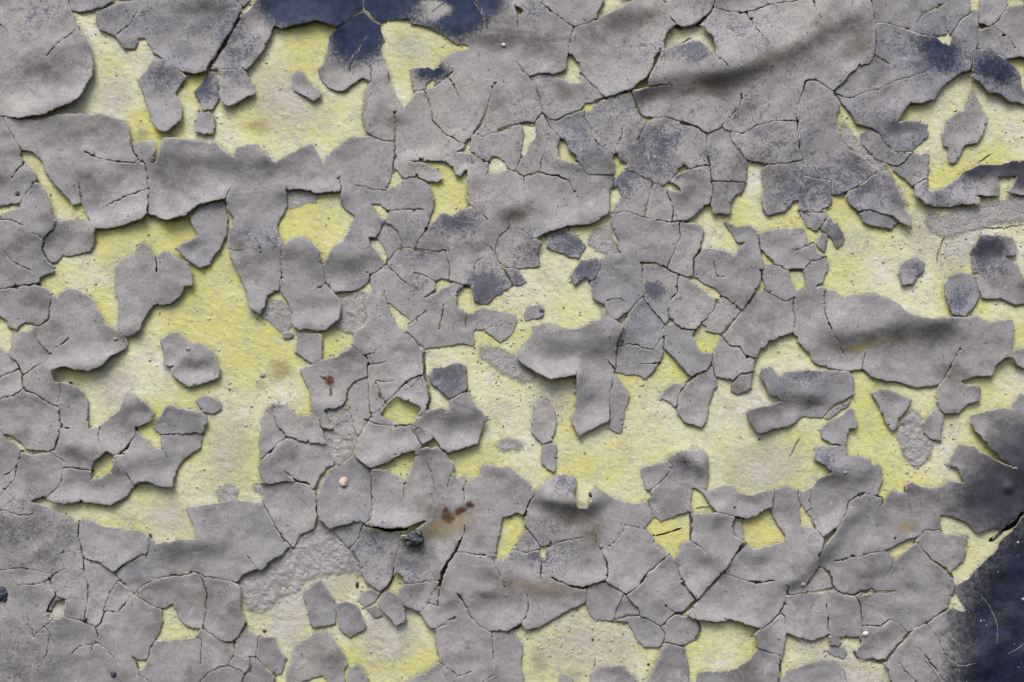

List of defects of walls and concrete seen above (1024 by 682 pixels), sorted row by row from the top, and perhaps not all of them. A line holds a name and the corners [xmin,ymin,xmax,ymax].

crack [207,7,245,71]
crack [0,213,59,326]
crack [13,520,164,661]
crack [0,339,205,516]
crack [261,407,408,548]
peeling [0,0,695,682]
crack [346,344,471,498]
crack [339,113,524,304]
rust [442,502,474,523]
peeling [318,0,1024,682]
crack [381,459,968,682]
crack [407,0,1014,421]